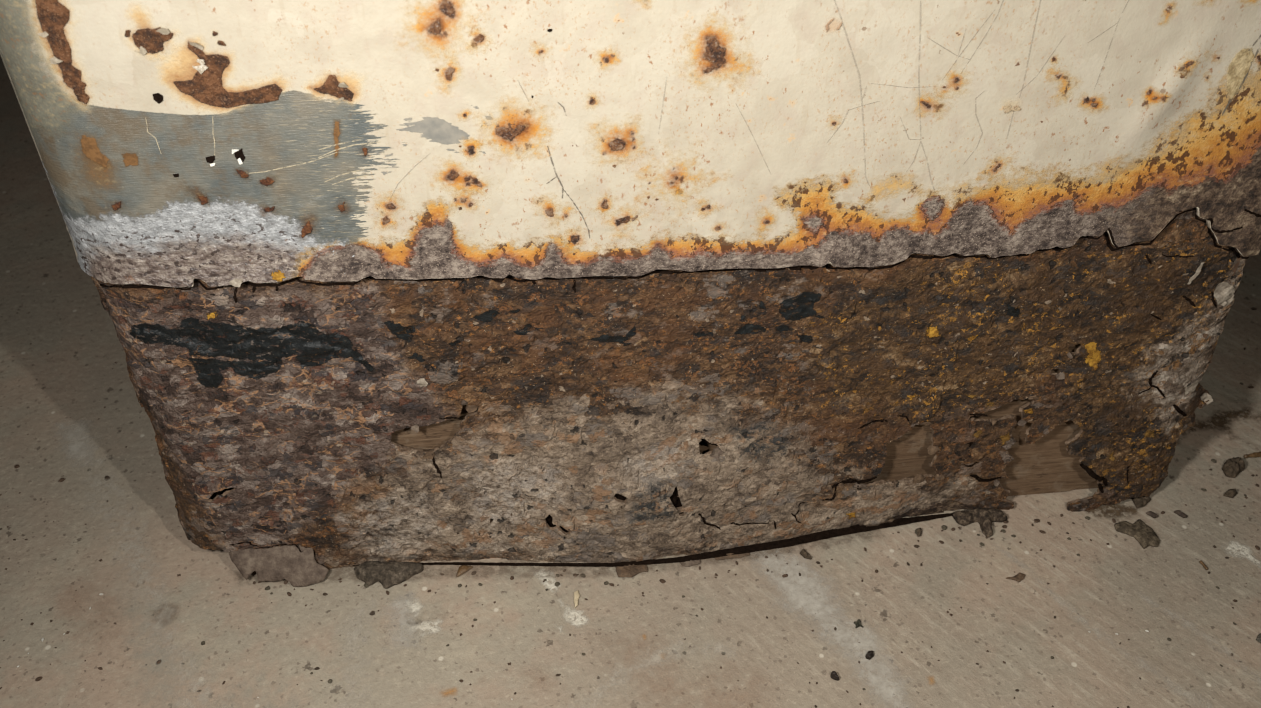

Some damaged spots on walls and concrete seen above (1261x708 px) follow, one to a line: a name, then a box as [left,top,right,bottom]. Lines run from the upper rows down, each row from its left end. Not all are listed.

rust [413,0,460,49]
rust [599,52,620,67]
rust [692,26,750,83]
rust [41,55,1261,287]
crack [100,209,1261,303]
rust [926,326,940,338]
rust [1082,342,1101,370]
spalling [970,395,1096,503]
rust [846,502,978,537]